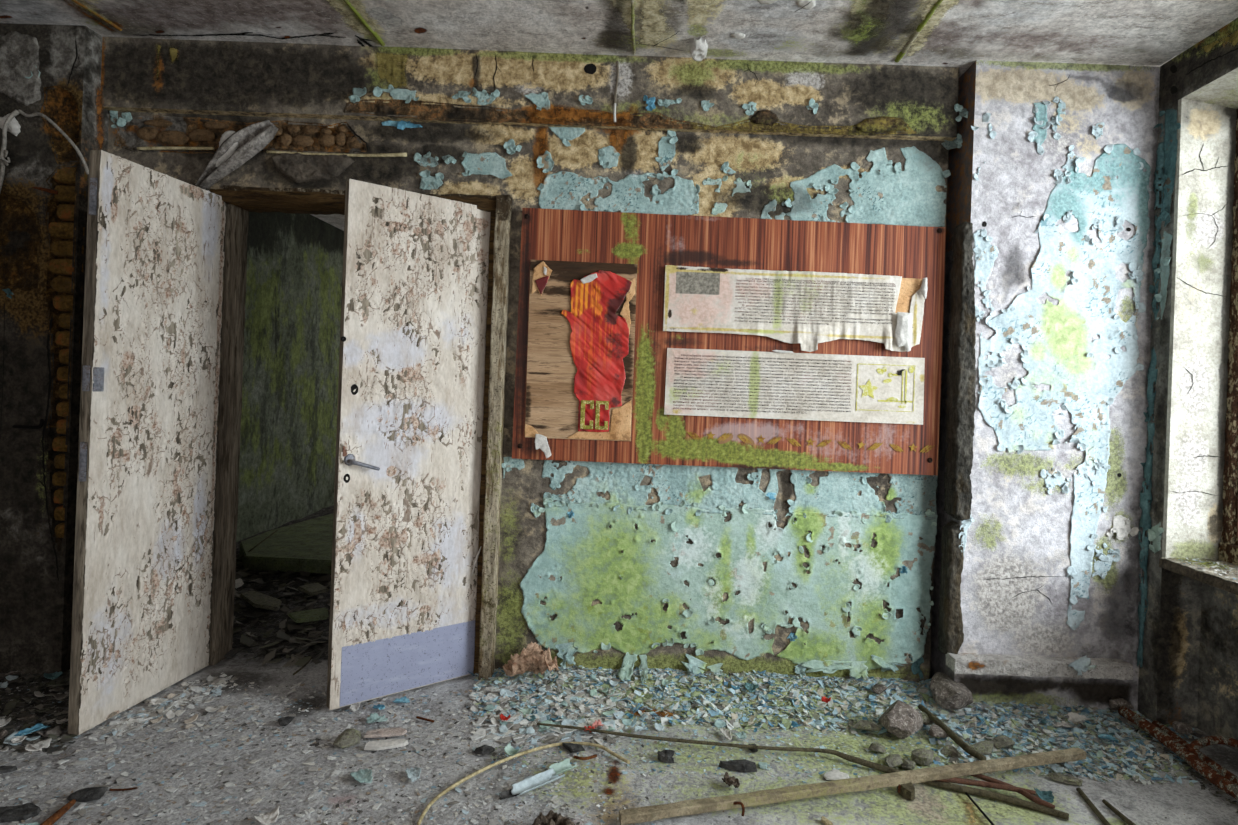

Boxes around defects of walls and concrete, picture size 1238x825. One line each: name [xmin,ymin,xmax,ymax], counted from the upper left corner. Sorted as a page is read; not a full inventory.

damp [602,0,625,48]
damp [846,0,919,55]
spalling [584,64,596,74]
flaking render [0,70,87,555]
peeling [109,84,1181,734]
peeling [714,720,762,740]